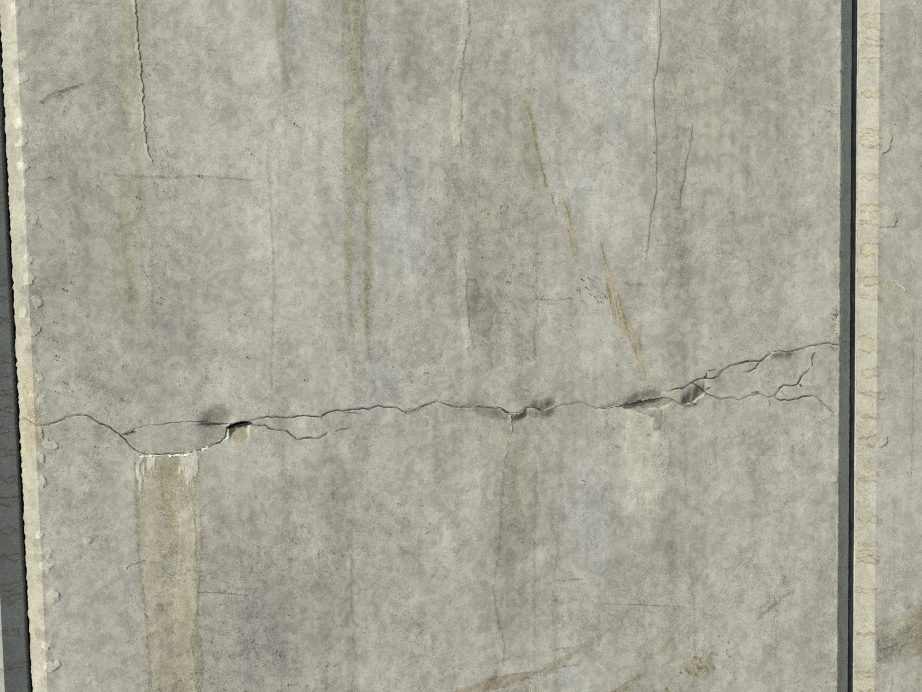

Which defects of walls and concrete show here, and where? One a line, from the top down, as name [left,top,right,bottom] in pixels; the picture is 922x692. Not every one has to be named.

crack [20,342,839,455]
efflorescence [136,446,210,488]
leakage [173,507,197,692]